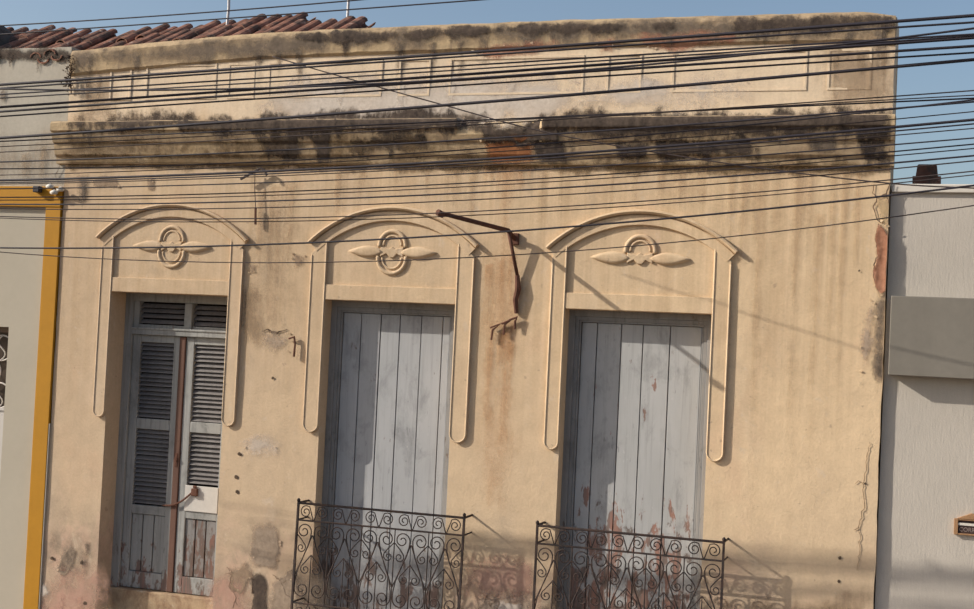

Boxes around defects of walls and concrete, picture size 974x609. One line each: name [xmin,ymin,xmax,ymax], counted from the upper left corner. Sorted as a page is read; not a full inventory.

leakage [0,15,895,73]
leakage [66,107,891,176]
flaking render [859,199,890,372]
leakage [873,298,885,380]
crack [855,447,869,566]
leakage [251,574,267,609]
spalling [476,593,532,609]